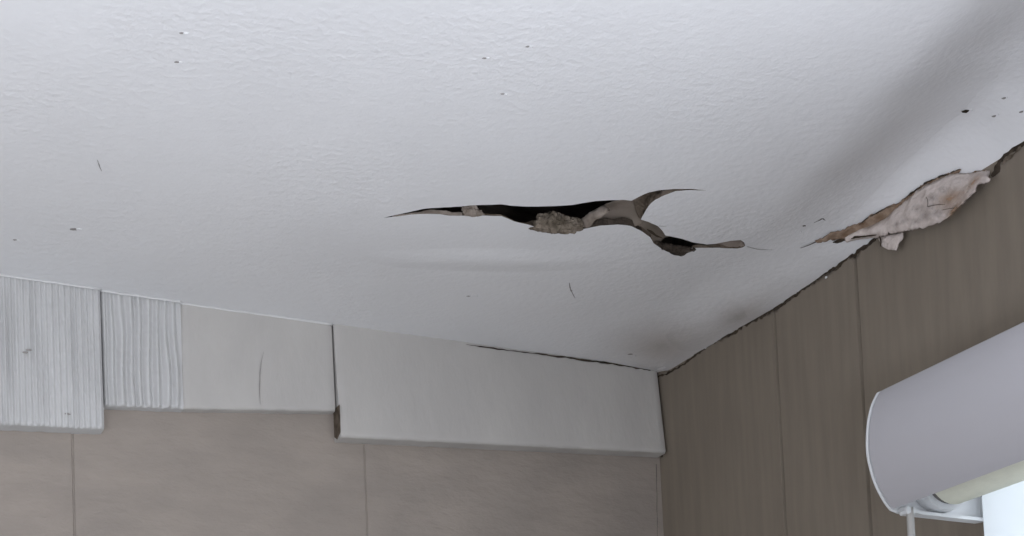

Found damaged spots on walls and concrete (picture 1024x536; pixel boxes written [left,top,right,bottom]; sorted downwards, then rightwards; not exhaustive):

crack [385,189,772,256]
peeling [801,169,991,251]